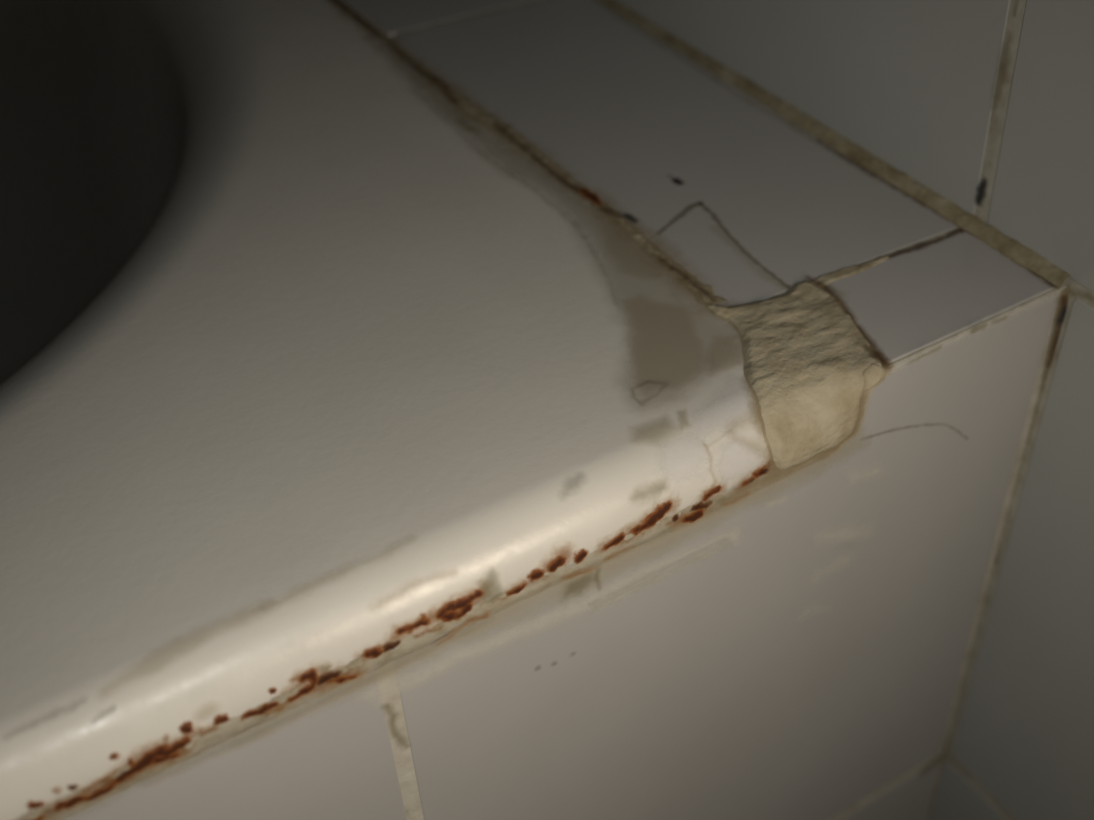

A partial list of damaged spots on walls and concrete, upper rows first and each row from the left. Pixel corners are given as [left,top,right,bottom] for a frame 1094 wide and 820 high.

leakage [334,0,637,232]
crack [657,202,791,289]
rust [603,460,771,556]
rust [507,549,588,596]
rust [363,589,488,659]
rust [28,668,359,820]